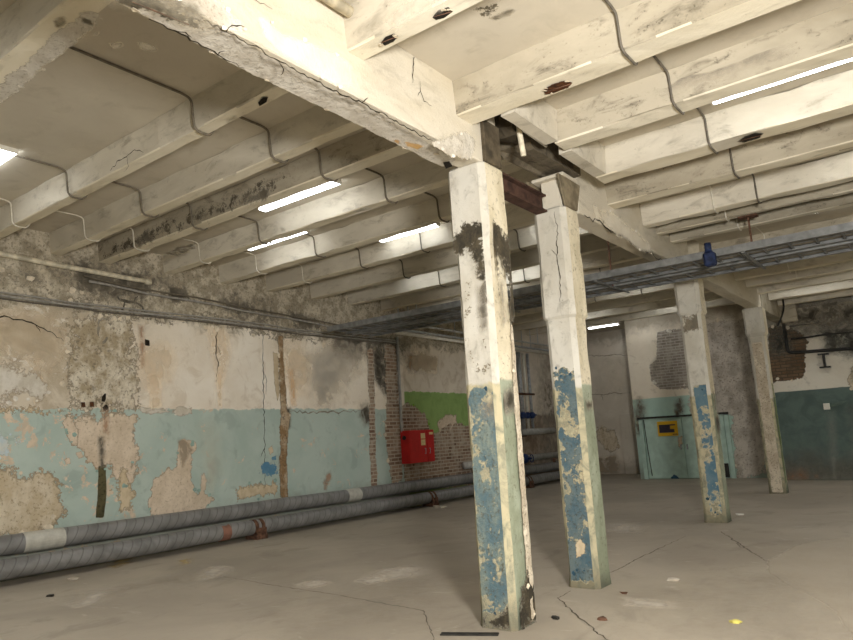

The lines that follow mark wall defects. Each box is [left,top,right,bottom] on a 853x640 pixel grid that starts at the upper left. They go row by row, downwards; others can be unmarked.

spalling [0,12,102,103]
damp [164,0,204,20]
crack [149,19,435,142]
spalling [116,0,476,166]
damp [51,176,285,307]
damp [453,220,488,327]
damp [493,220,515,322]
spalling [0,433,68,536]
spalling [0,287,326,518]
spalling [511,323,535,621]
peeling [553,367,594,584]
spalling [650,314,809,517]